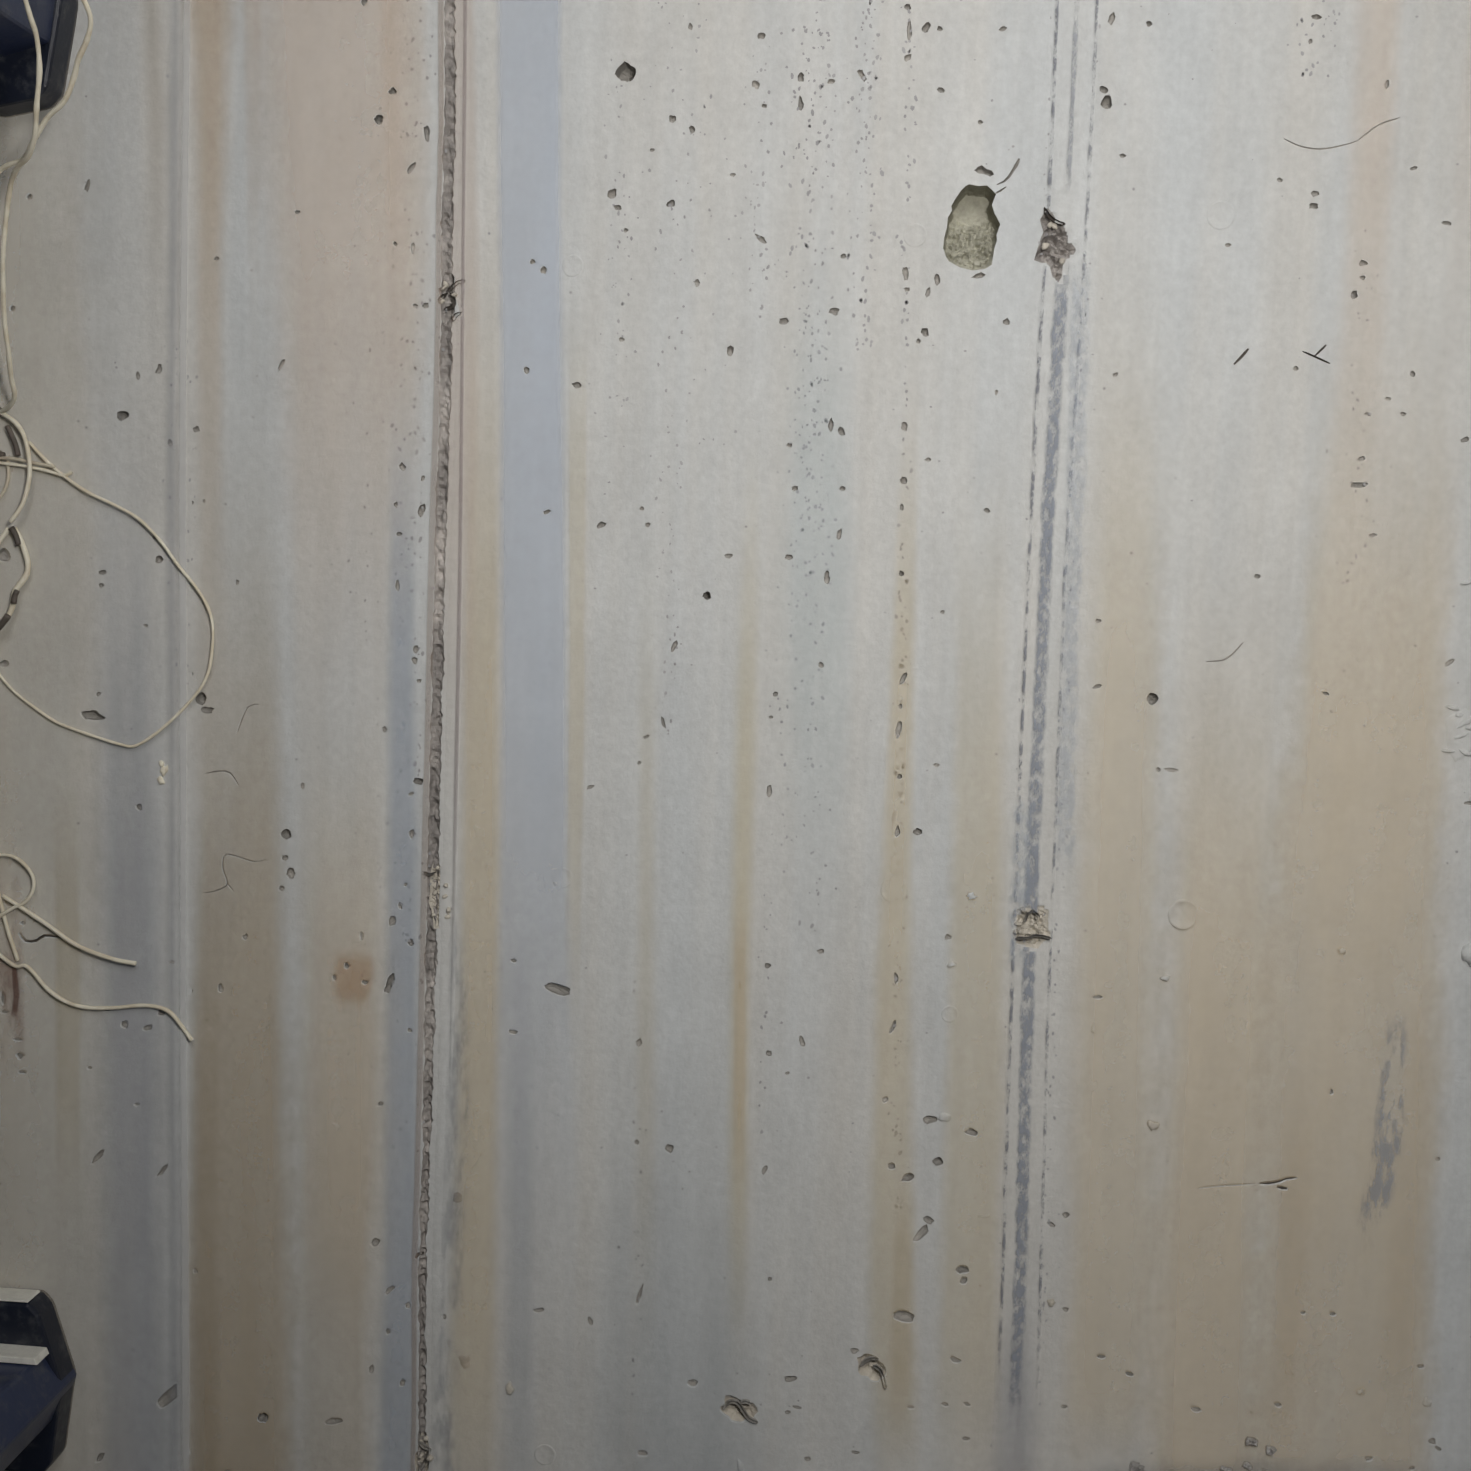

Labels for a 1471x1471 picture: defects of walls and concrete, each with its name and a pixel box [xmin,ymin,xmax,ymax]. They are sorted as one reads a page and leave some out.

leakage [1048,3,1093,200]
spalling [902,158,1020,298]
spalling [1034,207,1076,282]
leakage [1013,269,1081,918]
spalling [1013,905,1051,949]
leakage [999,938,1052,1376]